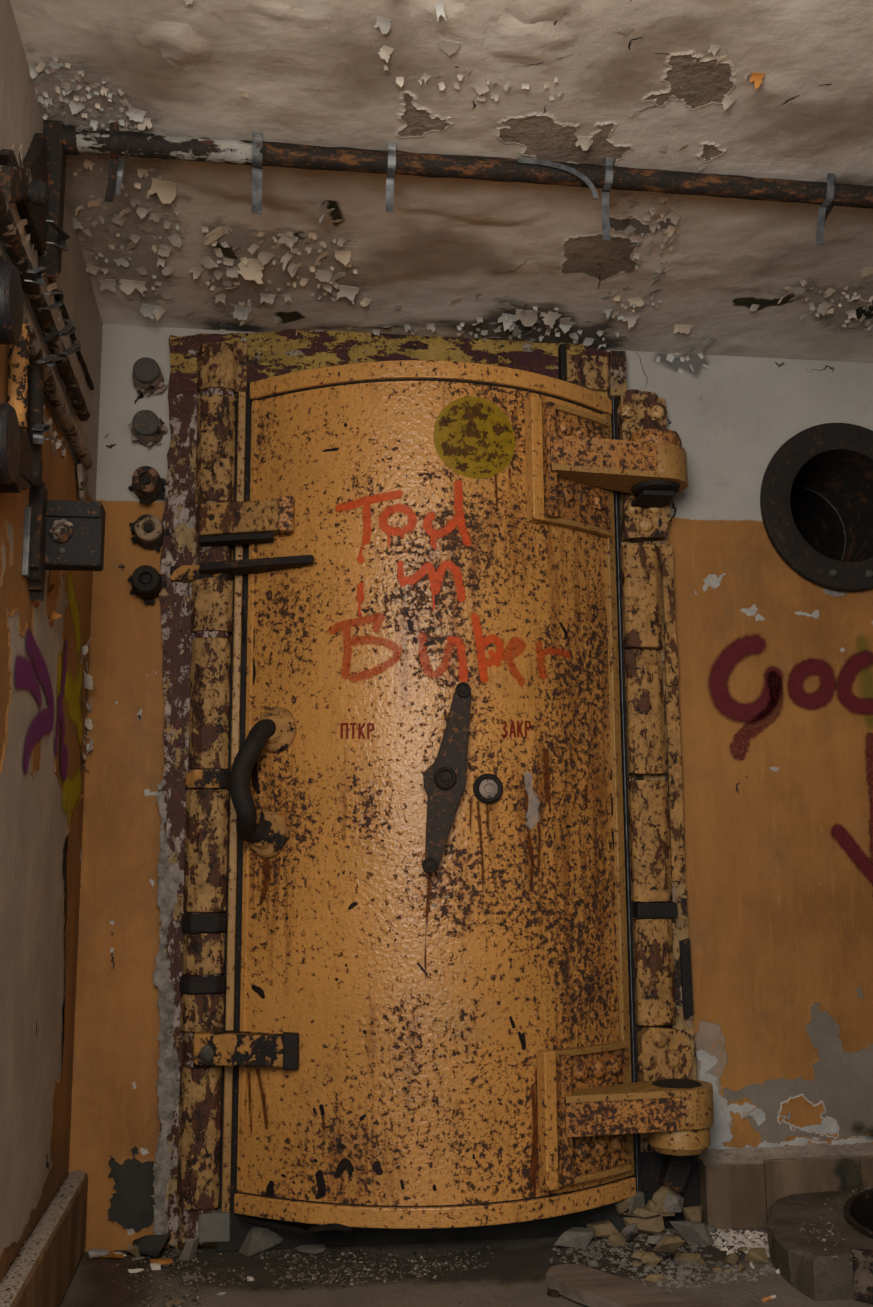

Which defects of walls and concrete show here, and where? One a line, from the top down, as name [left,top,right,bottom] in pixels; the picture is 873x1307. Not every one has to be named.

peeling [29,56,153,133]
peeling [374,16,765,166]
peeling [66,154,373,335]
spalling [733,266,873,334]
peeling [0,570,85,1259]
corrosion [259,859,270,906]
corrosion [469,797,489,889]
corrosion [525,749,551,891]
spalling [105,772,183,1235]
corrosion [248,1069,268,1133]
corrosion [530,1069,538,1198]
peeling [695,1000,873,1145]